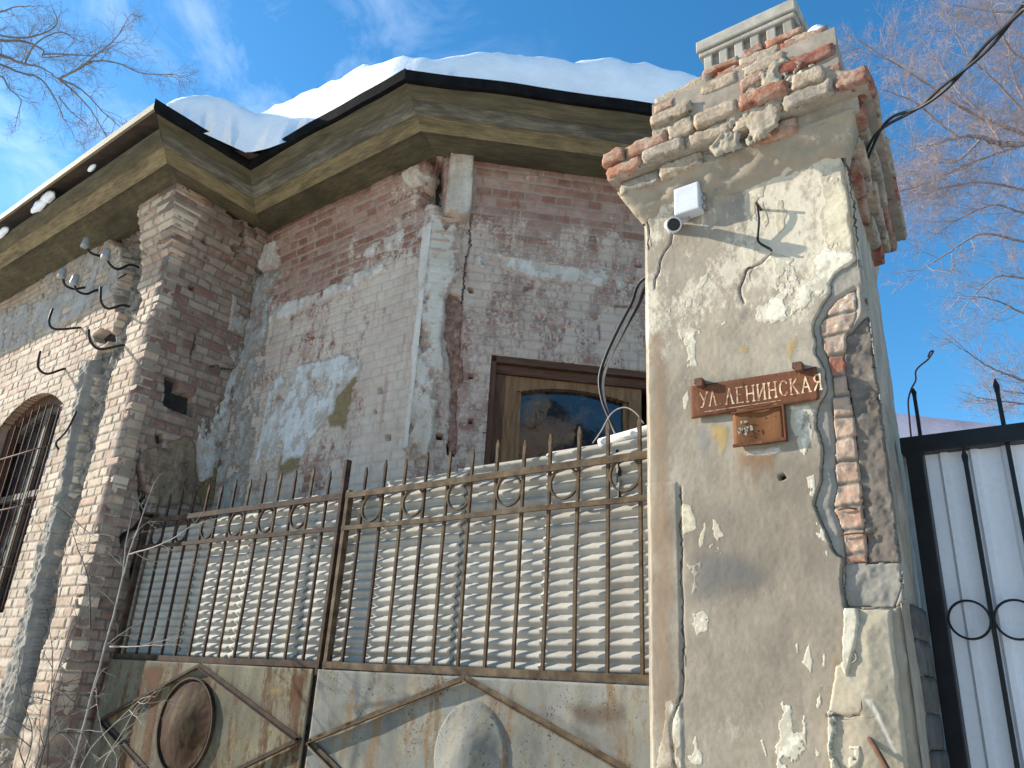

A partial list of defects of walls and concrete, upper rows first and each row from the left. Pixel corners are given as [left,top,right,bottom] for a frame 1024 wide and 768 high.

crack [461,221,472,303]
crack [646,221,673,288]
crack [740,253,772,302]
flaking render [228,294,249,335]
flaking render [137,343,243,508]
flaking render [256,354,363,474]
peeling [678,328,701,409]
spalling [756,166,907,610]
peeling [680,504,725,554]
peeling [692,611,709,636]
peeling [760,700,820,768]